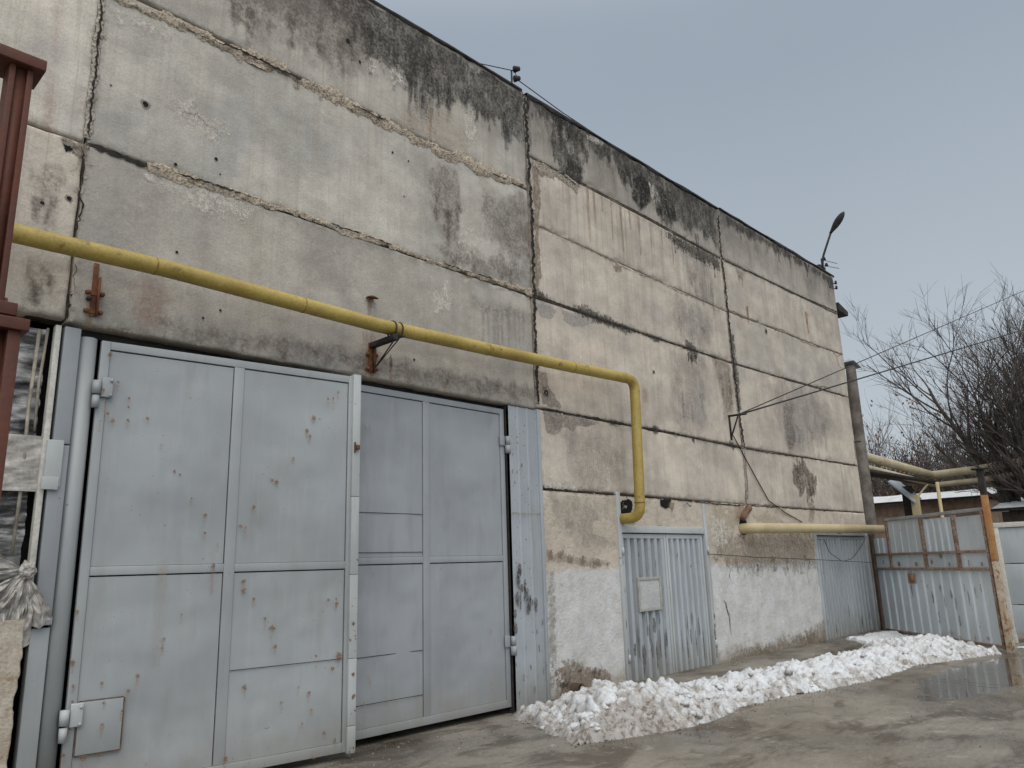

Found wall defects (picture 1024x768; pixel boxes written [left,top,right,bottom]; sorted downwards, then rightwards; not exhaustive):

crack [66,147,98,321]
spalling [62,0,595,434]
water stain [793,458,817,501]